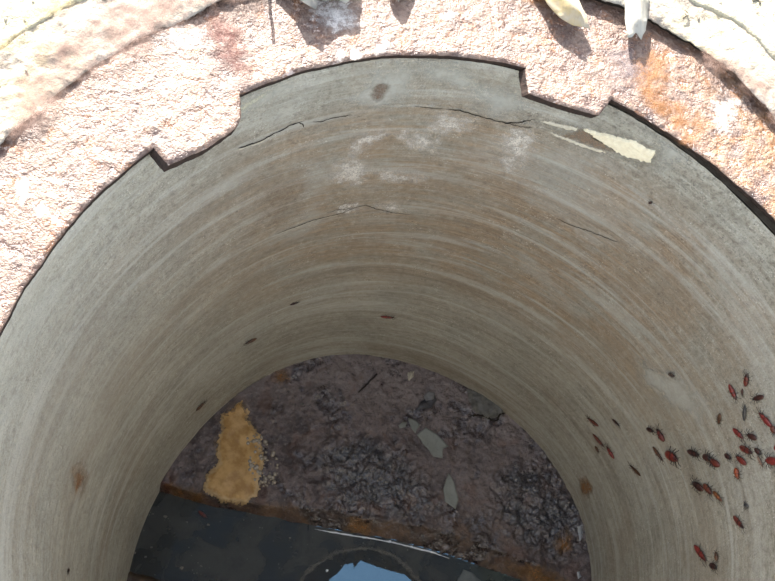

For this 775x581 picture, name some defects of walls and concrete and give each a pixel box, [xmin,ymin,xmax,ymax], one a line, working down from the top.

corrosion [12,0,202,134]
corrosion [207,19,245,74]
corrosion [614,51,699,126]
crack [239,115,349,150]
water stain [332,130,386,186]
water stain [399,115,468,149]
crack [414,106,535,128]
water stain [501,129,534,171]
spalling [541,121,657,164]
crack [278,205,407,234]
corrosion [193,400,264,506]